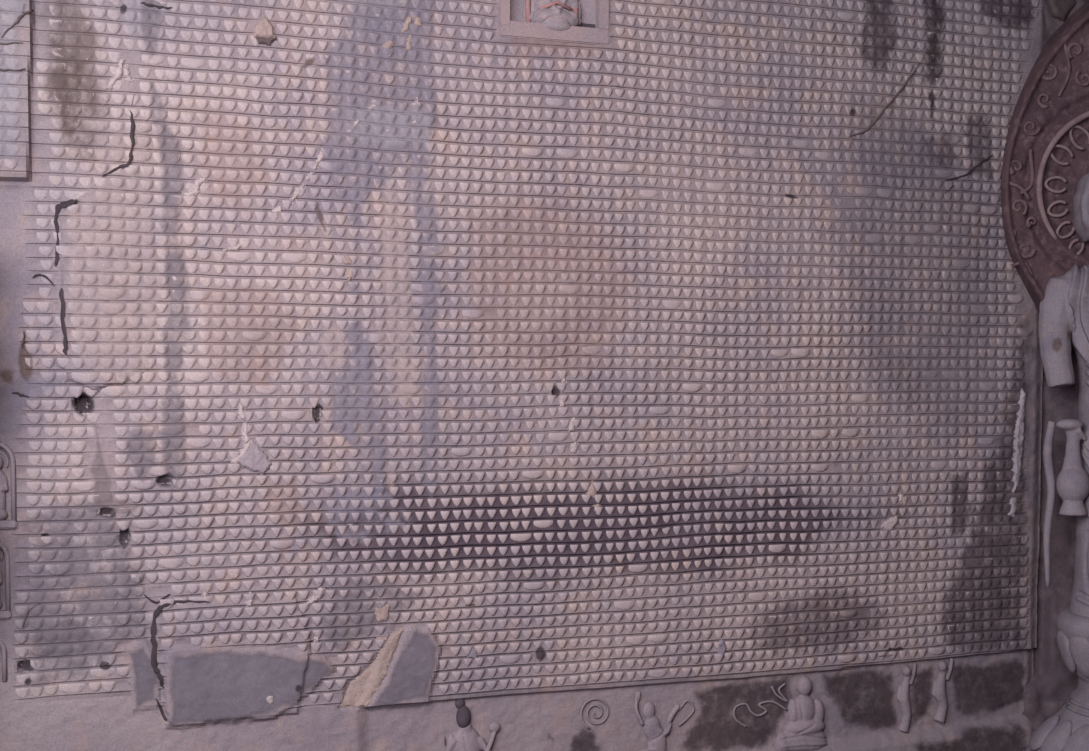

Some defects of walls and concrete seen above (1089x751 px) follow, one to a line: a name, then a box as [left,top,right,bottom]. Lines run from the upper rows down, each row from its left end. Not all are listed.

crack [0,6,34,71]
crack [102,96,135,177]
leakage [325,0,441,318]
crack [850,62,920,137]
crack [32,199,78,357]
crack [139,576,209,721]
spalling [340,603,404,709]